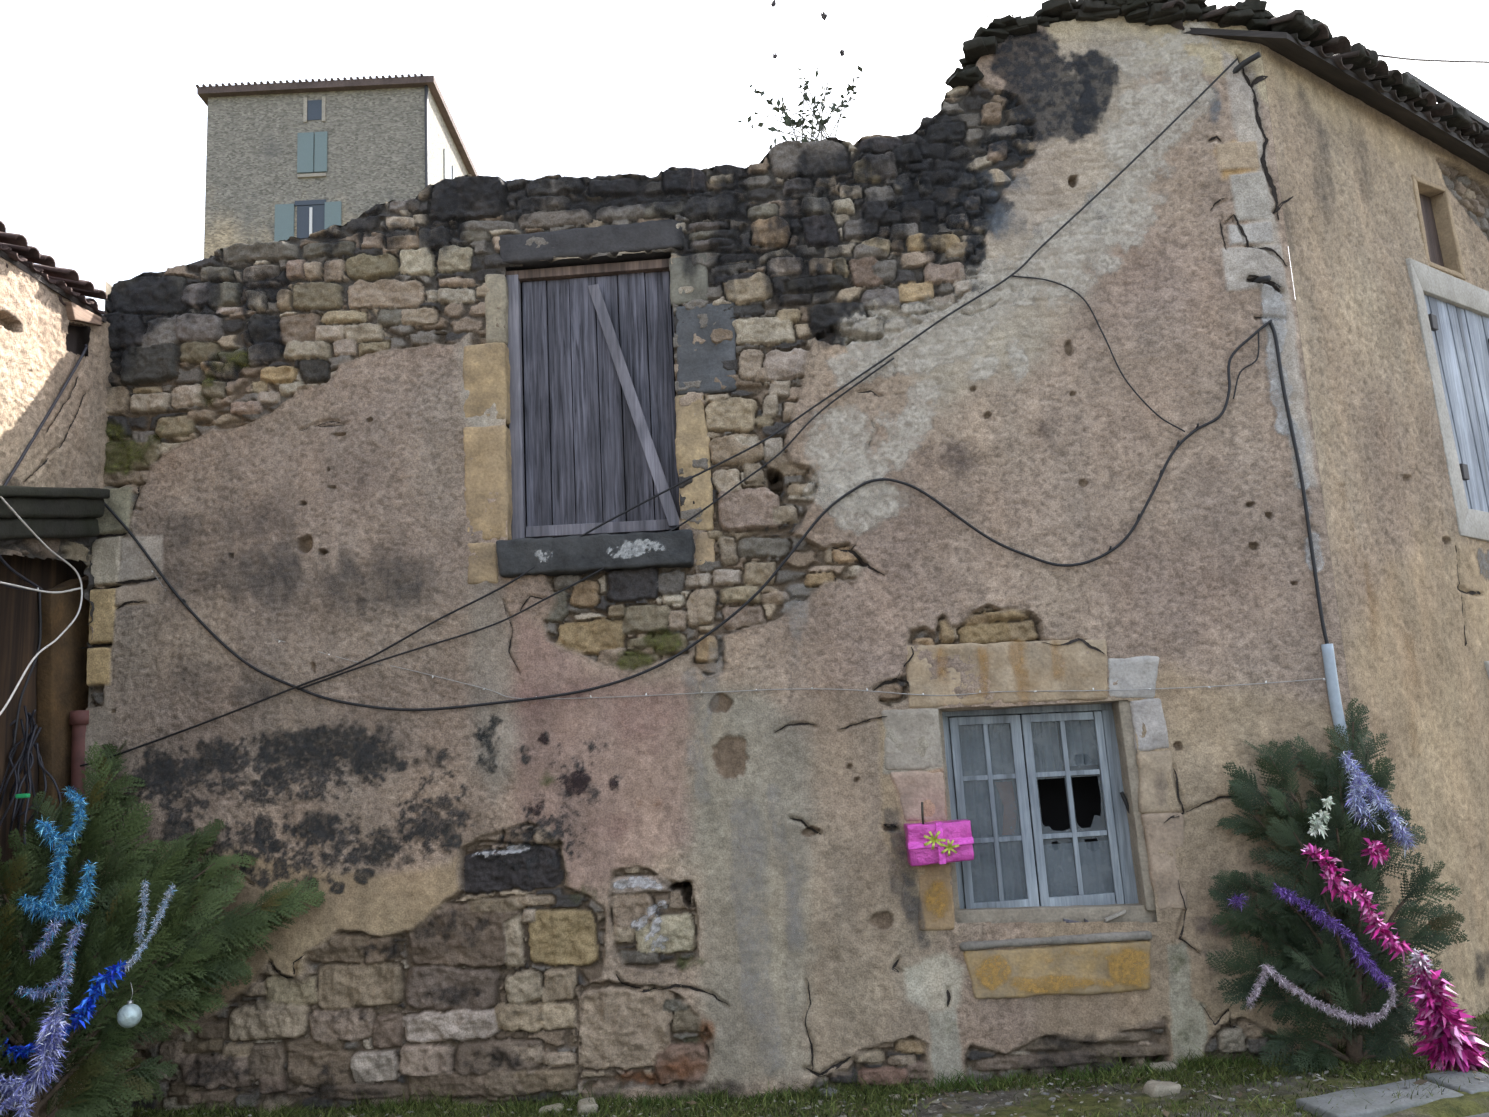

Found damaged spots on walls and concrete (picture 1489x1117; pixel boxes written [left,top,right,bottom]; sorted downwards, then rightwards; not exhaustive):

damp [103,268,290,387]
flaking render [103,79,1044,714]
damp [323,23,1220,532]
spalling [1063,340,1074,357]
crack [1210,54,1294,321]
flaking render [86,685,116,714]
flaking render [91,820,714,1113]